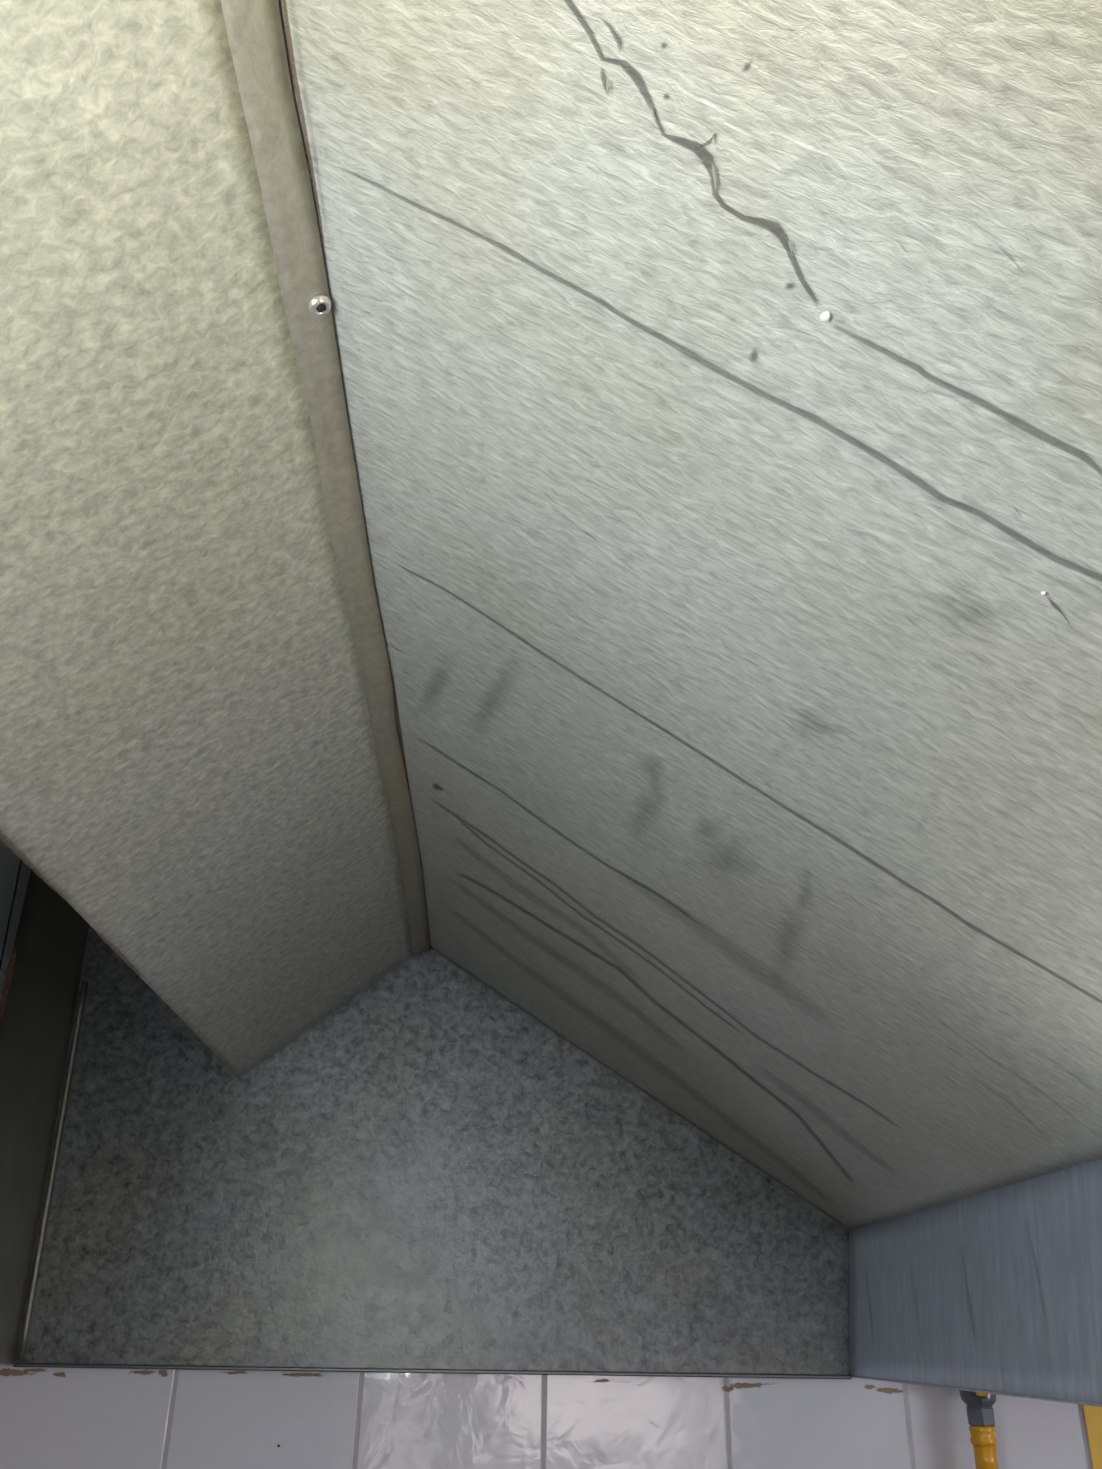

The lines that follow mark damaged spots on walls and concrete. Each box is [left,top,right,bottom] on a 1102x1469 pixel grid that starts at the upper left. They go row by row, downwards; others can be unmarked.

crack [564,0,830,322]